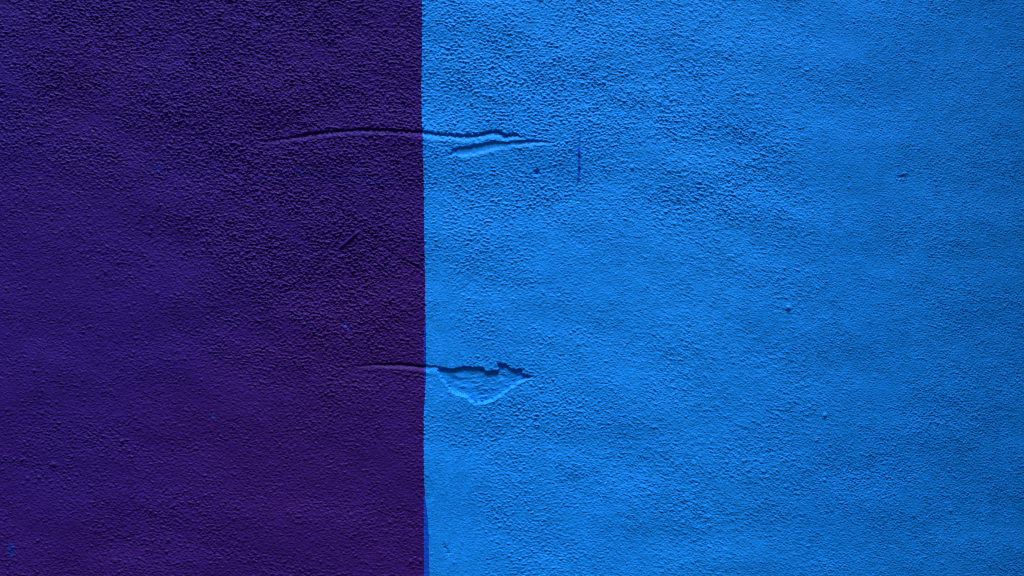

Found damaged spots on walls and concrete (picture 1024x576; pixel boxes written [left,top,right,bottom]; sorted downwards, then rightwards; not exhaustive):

crack [265,127,549,159]
crack [359,363,439,373]
flaking render [437,363,534,405]